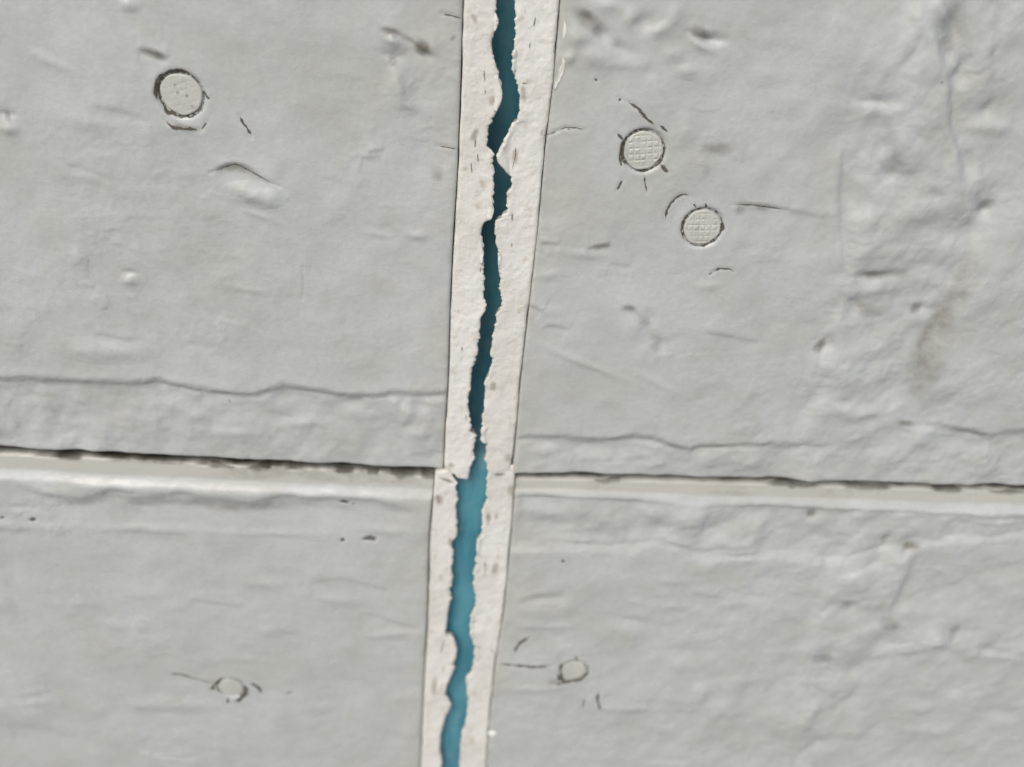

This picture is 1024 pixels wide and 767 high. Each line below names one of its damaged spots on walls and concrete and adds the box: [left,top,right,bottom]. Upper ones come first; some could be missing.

crack [441,13,536,380]
crack [438,408,601,762]